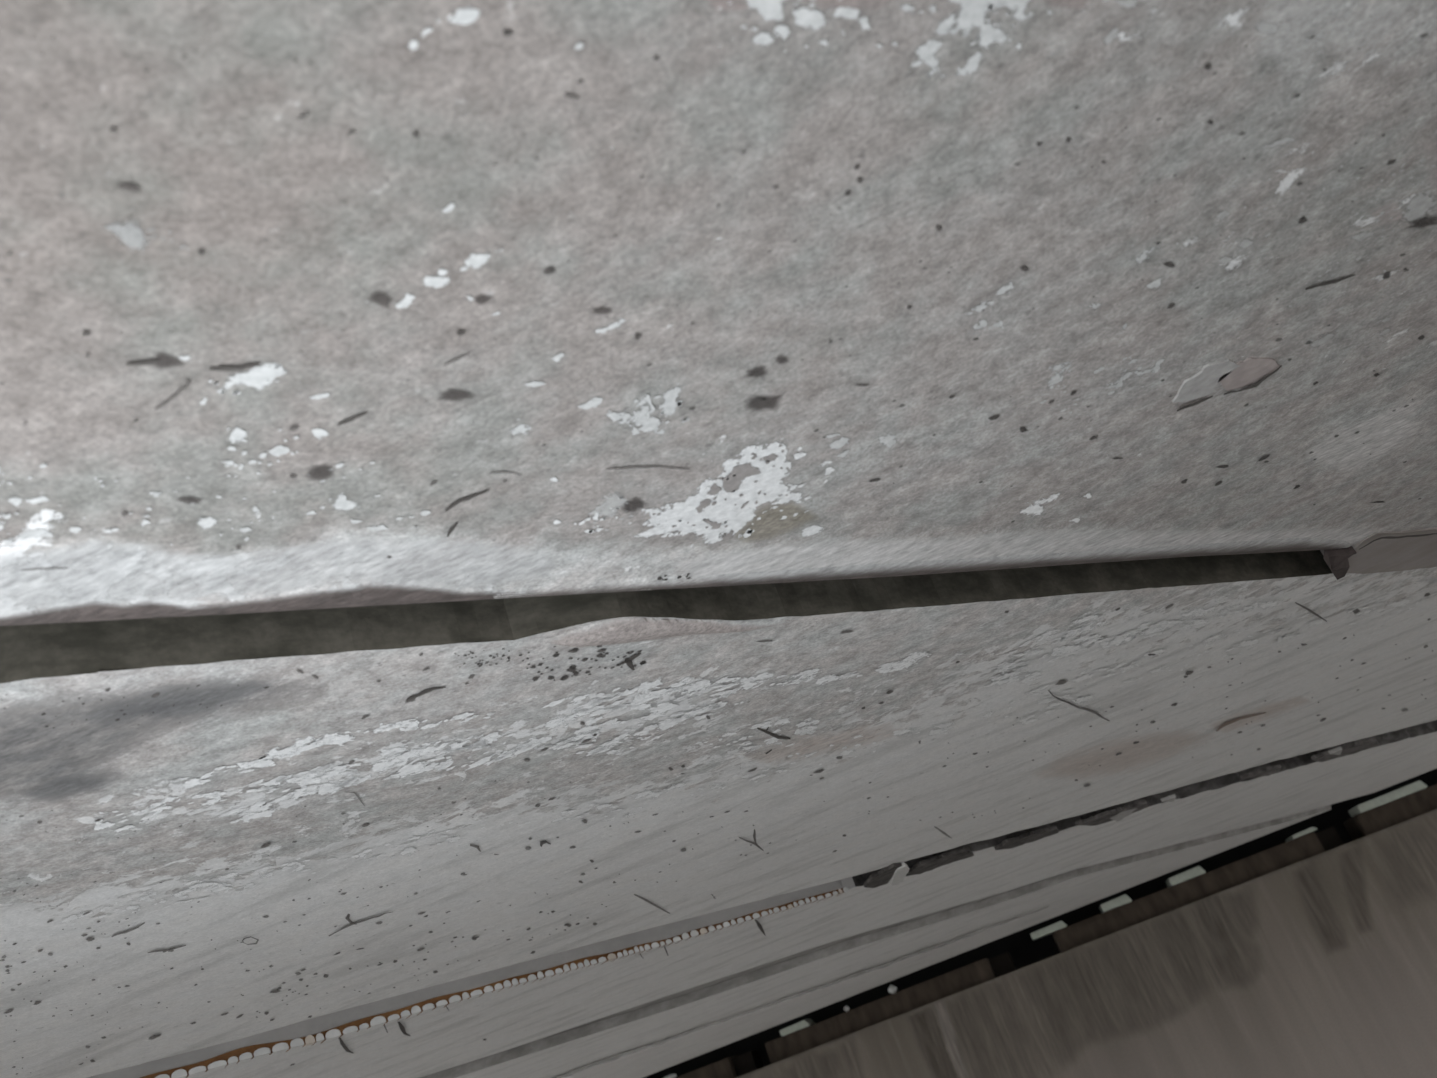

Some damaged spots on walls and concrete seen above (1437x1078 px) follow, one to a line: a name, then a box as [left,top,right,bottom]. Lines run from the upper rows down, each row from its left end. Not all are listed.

peeling [718,0,897,52]
peeling [901,0,1052,80]
peeling [101,477,190,546]
peeling [351,510,431,531]
peeling [553,433,849,548]
damp [0,660,343,818]
peeling [93,649,931,832]
crack [1216,712,1266,731]
corrosion [140,888,844,1078]